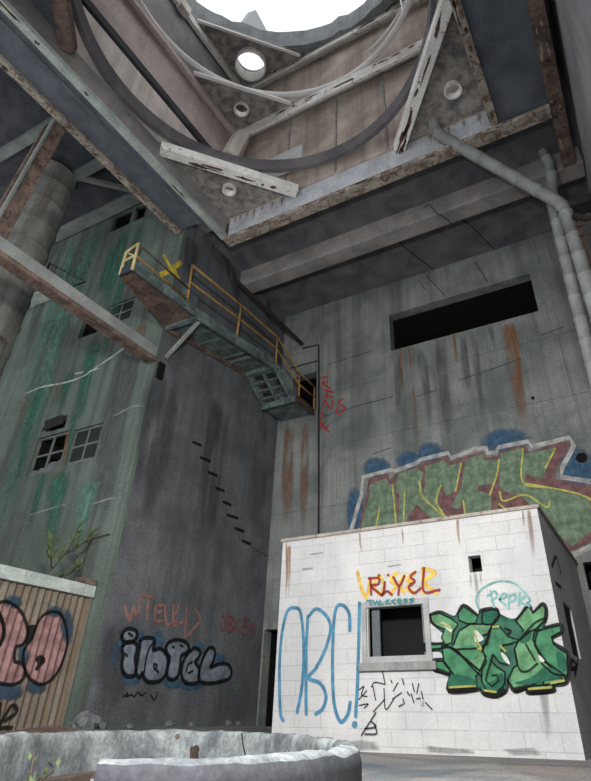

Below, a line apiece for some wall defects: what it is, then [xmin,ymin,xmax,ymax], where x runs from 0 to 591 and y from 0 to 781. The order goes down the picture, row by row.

water stain [100,229,141,313]
water stain [60,347,98,453]
water stain [31,474,68,532]
rust [283,432,292,503]